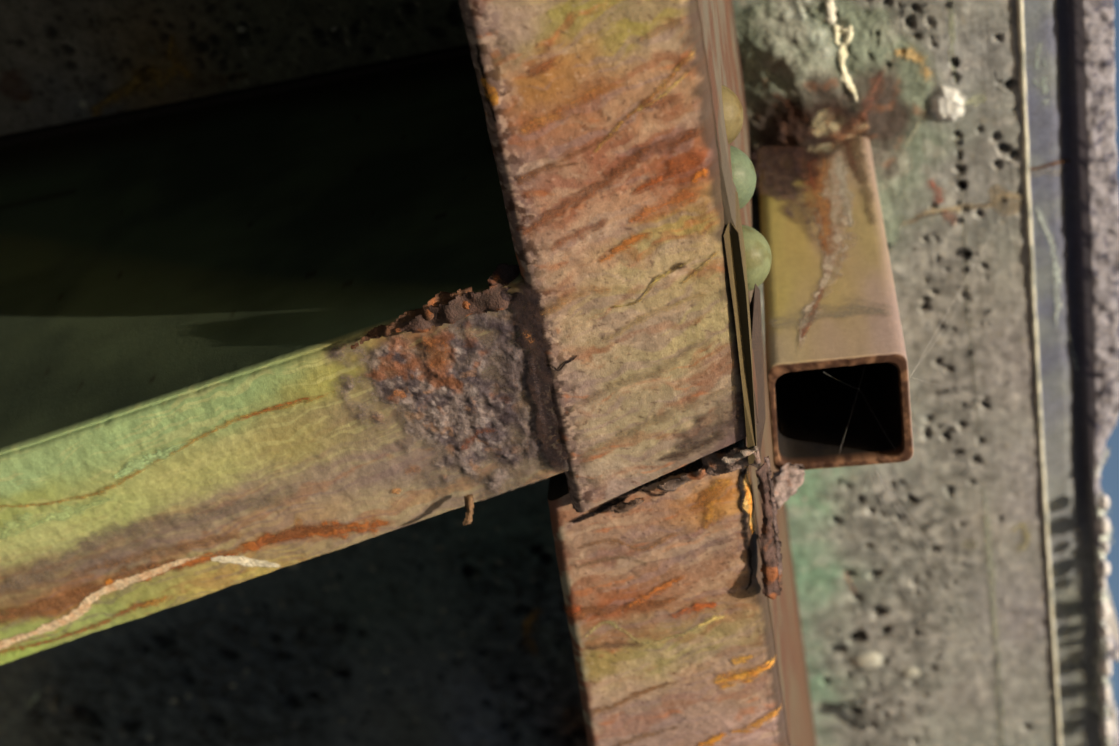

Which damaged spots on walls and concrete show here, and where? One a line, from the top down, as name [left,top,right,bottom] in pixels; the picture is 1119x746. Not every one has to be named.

rust [519,53,693,183]
rust [523,129,708,262]
rust [756,72,884,345]
rust [612,253,717,308]
rust [350,263,569,472]
rust [581,391,805,600]
rust [2,596,167,653]
rust [0,519,389,623]
rust [592,683,671,713]
rust [565,577,725,650]
rust [699,707,781,746]
rust [715,655,775,688]